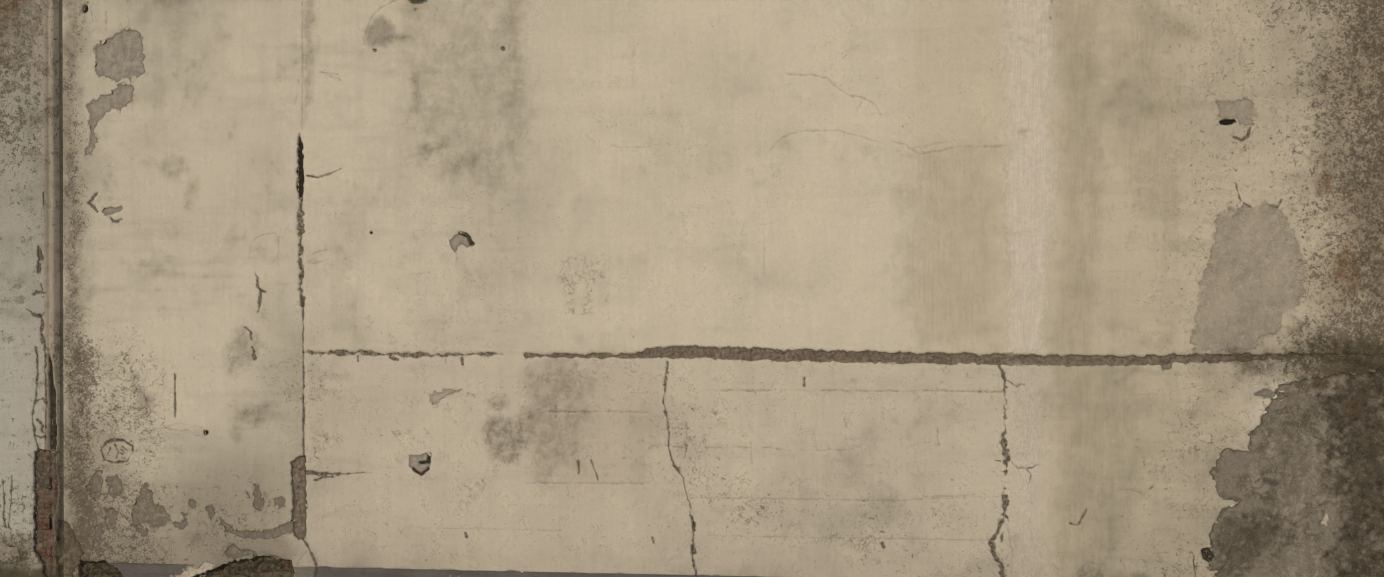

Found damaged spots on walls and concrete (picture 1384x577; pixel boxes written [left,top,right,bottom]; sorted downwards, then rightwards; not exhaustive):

peeling [85,26,148,157]
crack [245,275,266,360]
crack [297,135,364,481]
spalling [450,232,475,252]
spalling [0,355,307,577]
spalling [409,452,431,476]
crack [663,361,697,577]
crack [988,364,1033,577]
peeling [1200,363,1384,577]